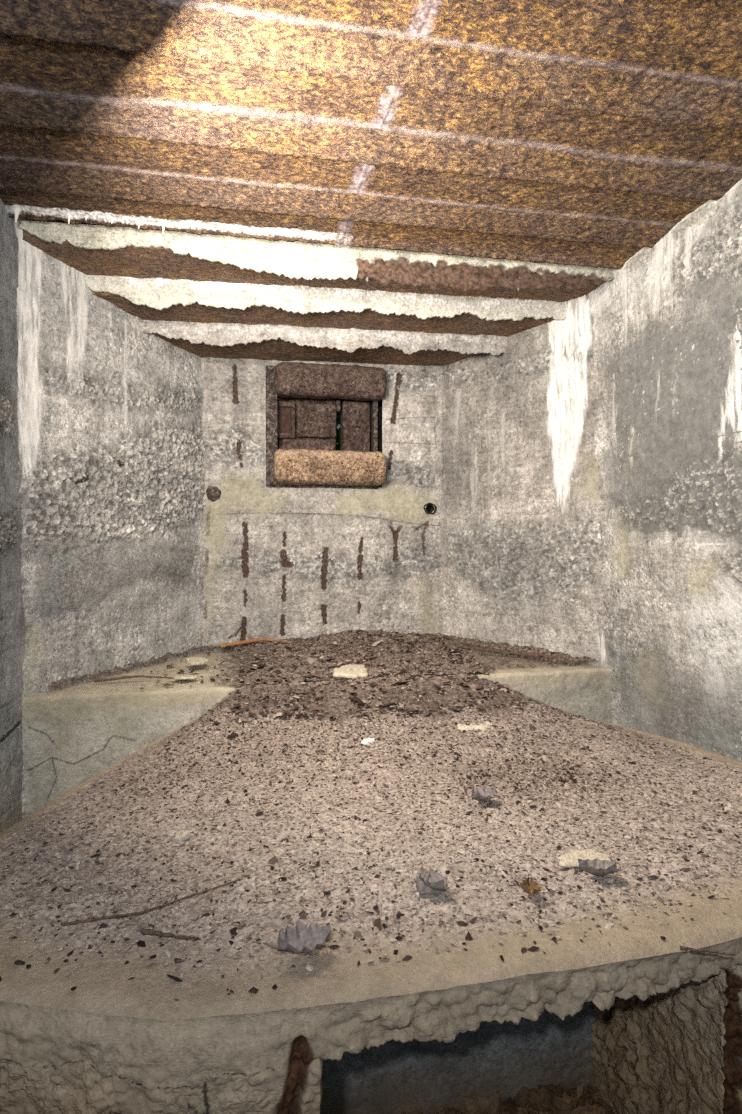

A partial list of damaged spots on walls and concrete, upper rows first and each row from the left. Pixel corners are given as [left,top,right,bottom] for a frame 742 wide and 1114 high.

leakage [619,266,635,325]
leakage [654,227,692,305]
corrosion [232,365,240,404]
leakage [106,276,592,511]
corrosion [391,373,404,424]
leakage [608,276,742,531]